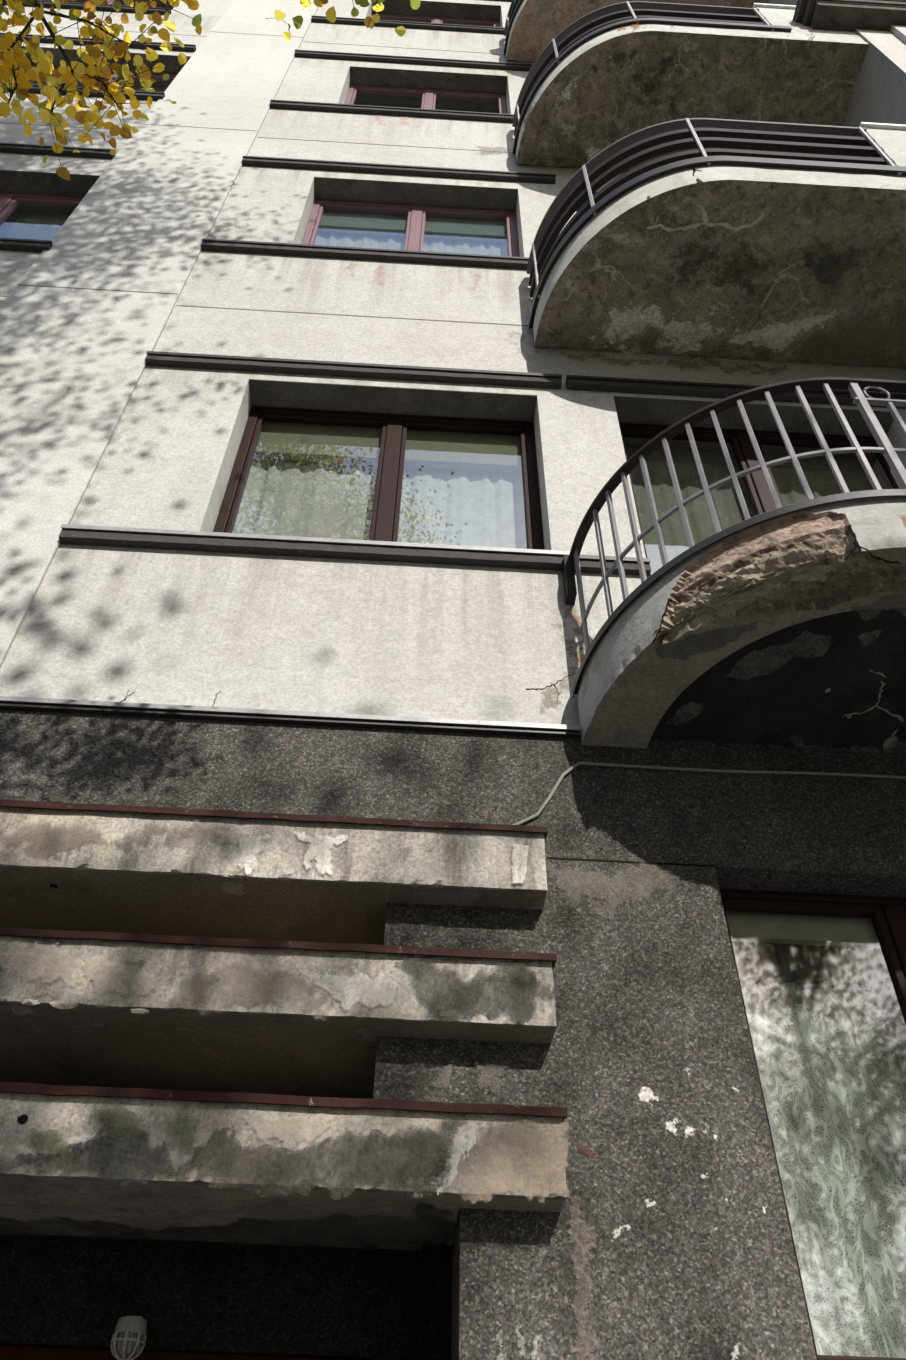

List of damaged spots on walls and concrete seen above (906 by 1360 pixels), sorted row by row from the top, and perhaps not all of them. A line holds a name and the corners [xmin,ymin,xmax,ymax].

water stain [574,301,850,375]
spalling [652,510,906,660]
peeling [726,631,835,679]
crack [526,673,574,703]
crack [842,669,905,738]
water stain [4,820,270,874]
water stain [296,831,348,874]
water stain [166,962,398,1018]
water stain [449,974,541,1022]
water stain [0,1117,569,1252]